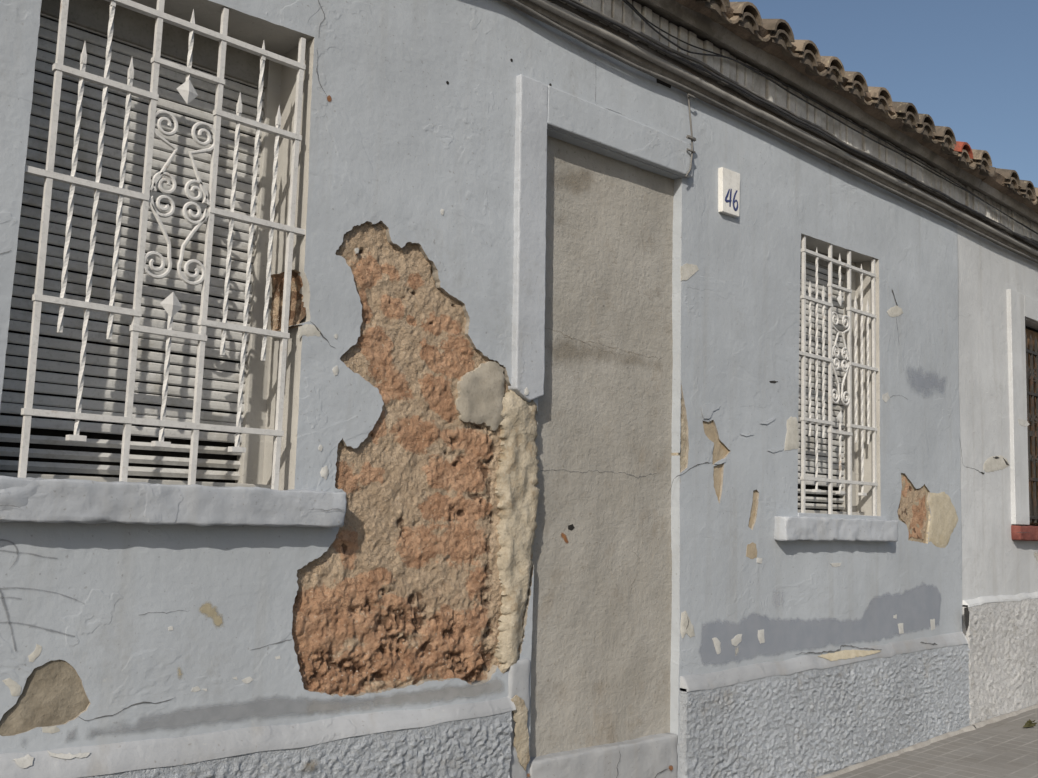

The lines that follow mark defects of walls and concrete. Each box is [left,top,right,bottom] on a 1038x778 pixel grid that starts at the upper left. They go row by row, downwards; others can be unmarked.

crack [317,0,326,94]
spalling [270,269,321,338]
spalling [292,222,540,696]
peeling [701,403,729,501]
peeling [981,455,1010,474]
peeling [748,490,757,528]
spalling [897,473,958,548]
spalling [0,644,89,736]
peeling [818,649,880,661]
peeling [511,695,530,771]